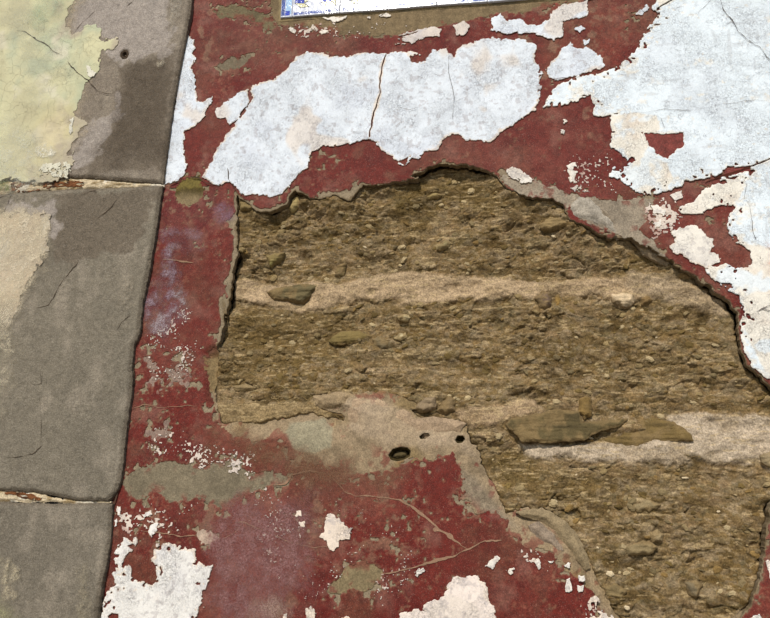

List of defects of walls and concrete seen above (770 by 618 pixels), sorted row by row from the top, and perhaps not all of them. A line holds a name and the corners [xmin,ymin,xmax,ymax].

peeling [0,0,119,184]
crack [353,53,387,140]
crack [705,158,770,249]
spalling [165,0,770,618]
rust [5,492,42,501]
crack [277,469,501,574]